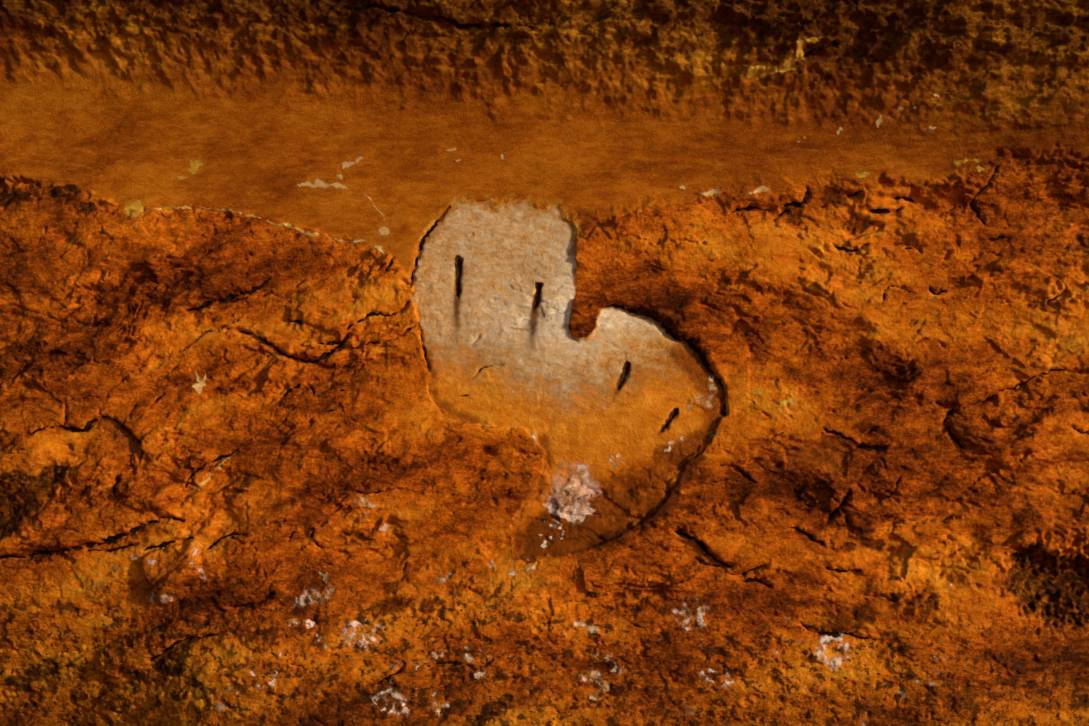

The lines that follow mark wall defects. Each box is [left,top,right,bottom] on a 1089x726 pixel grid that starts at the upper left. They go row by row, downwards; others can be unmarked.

crack [341,3,534,30]
crack [186,207,450,414]
rust [531,295,540,335]
spalling [410,195,725,563]
crack [30,407,144,458]
water stain [538,464,601,548]
crack [0,516,246,559]